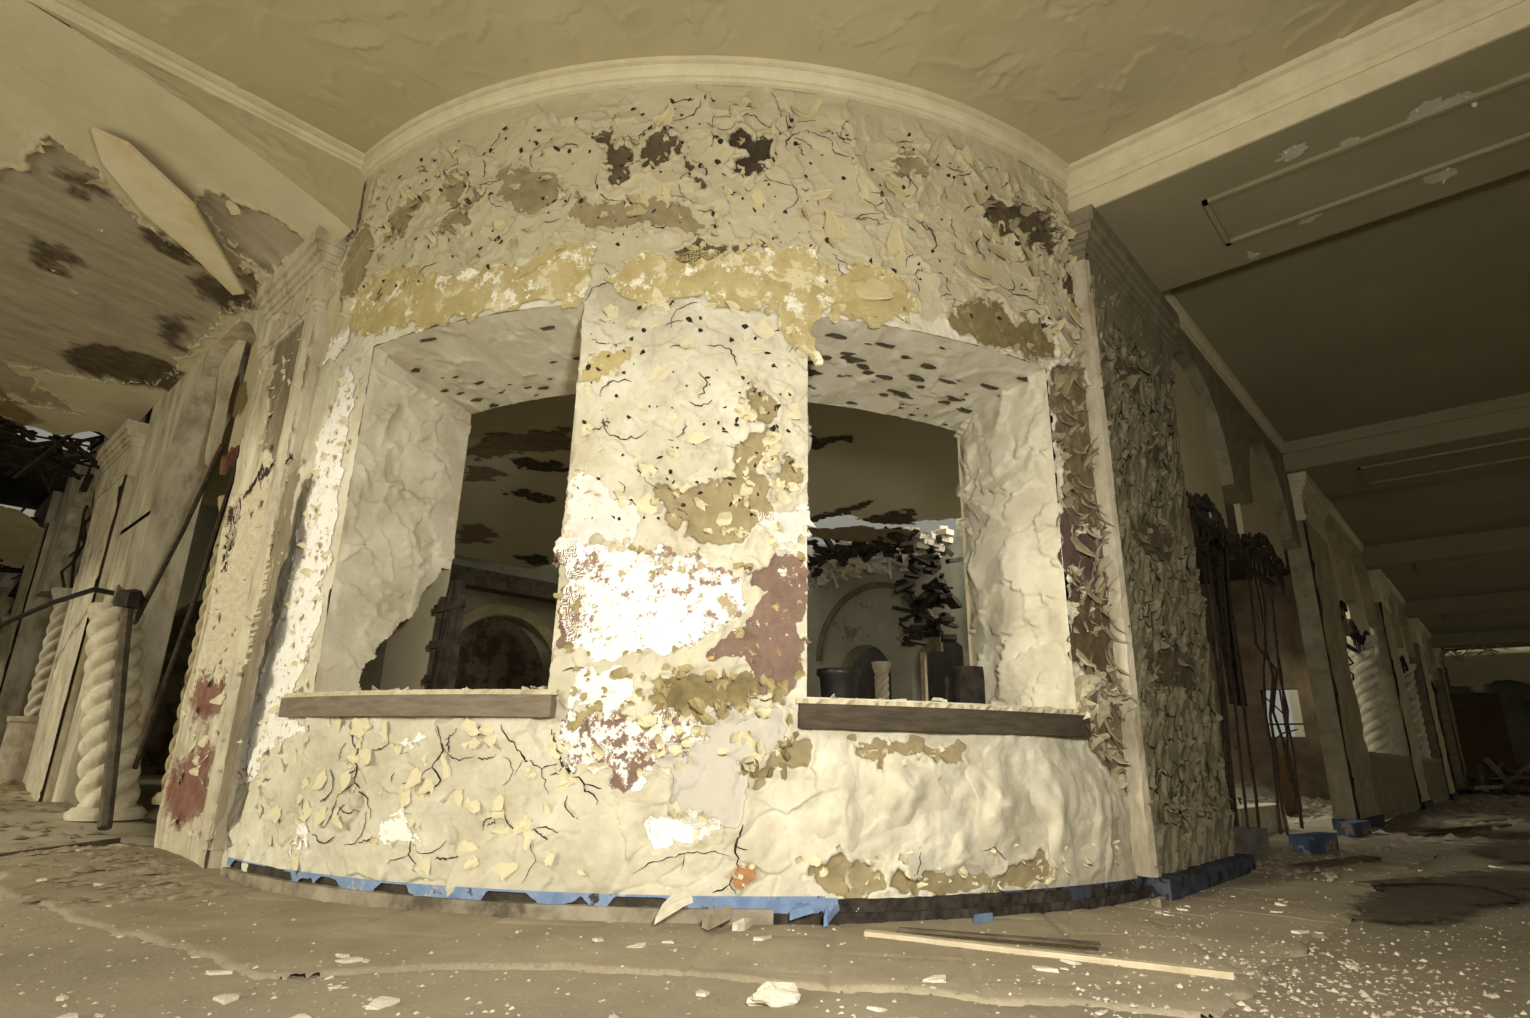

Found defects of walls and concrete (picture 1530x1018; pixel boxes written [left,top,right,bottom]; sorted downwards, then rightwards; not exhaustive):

flaking render [168,94,1308,881]
rust [162,670,226,833]
peeling [790,840,1120,927]
damp [1348,840,1530,922]